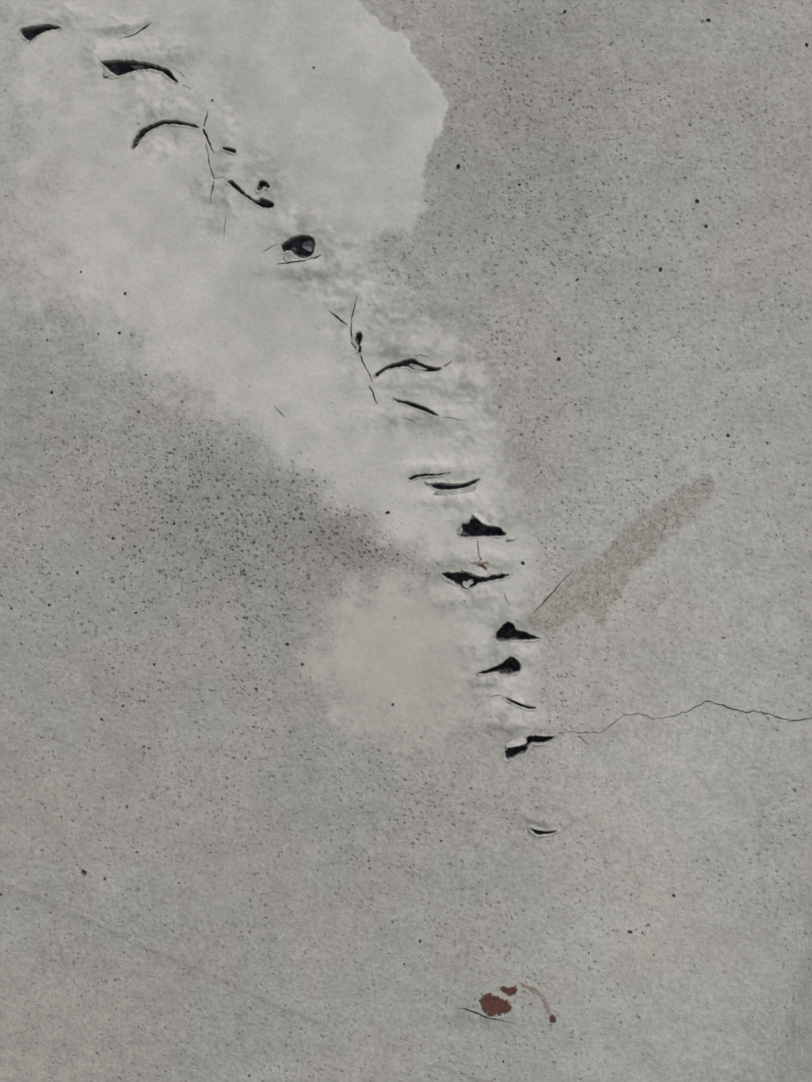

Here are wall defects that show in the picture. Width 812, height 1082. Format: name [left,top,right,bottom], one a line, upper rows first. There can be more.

crack [203,111,227,231]
crack [330,299,377,404]
crack [535,571,573,611]
crack [559,700,812,745]
corrosion [474,976,563,1026]